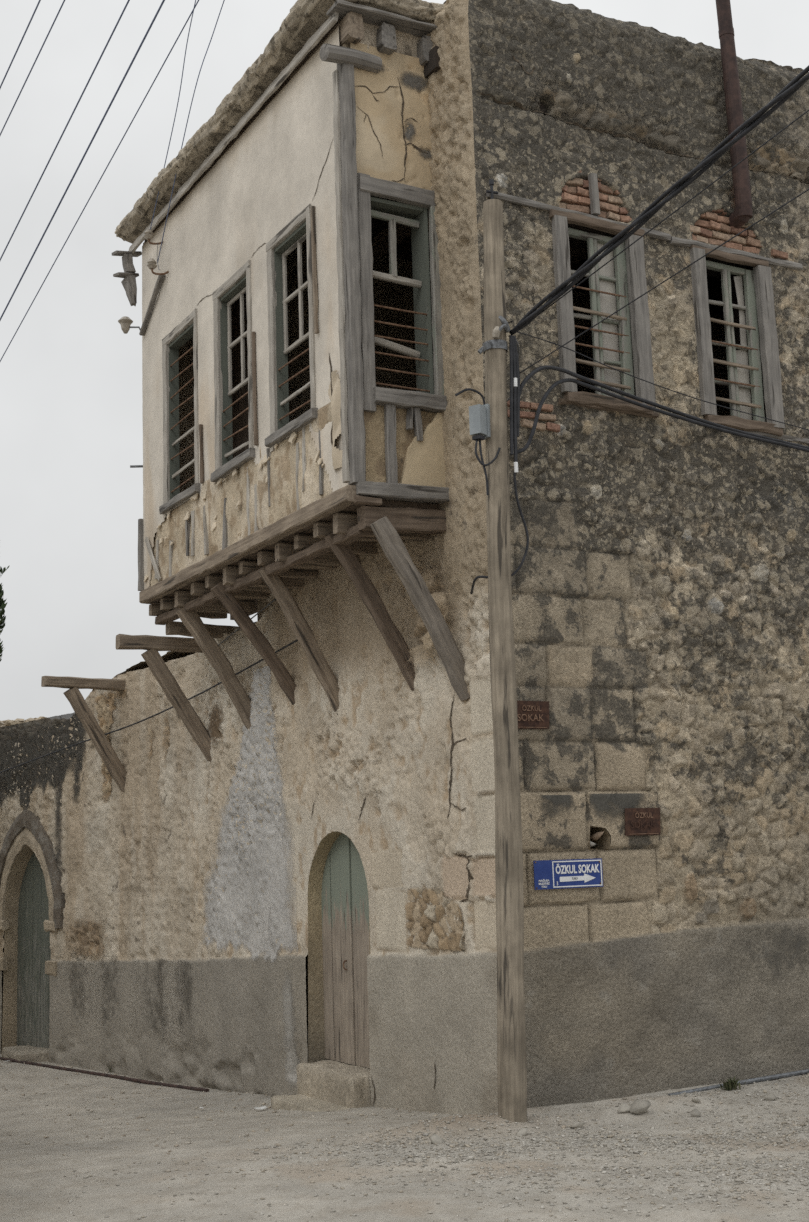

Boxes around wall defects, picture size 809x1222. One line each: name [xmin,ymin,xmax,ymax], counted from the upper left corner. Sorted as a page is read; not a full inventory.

crack [357,82,426,182]
spalling [559,170,632,223]
spalling [690,209,788,260]
spalling [507,400,561,433]
spalling [405,888,465,951]